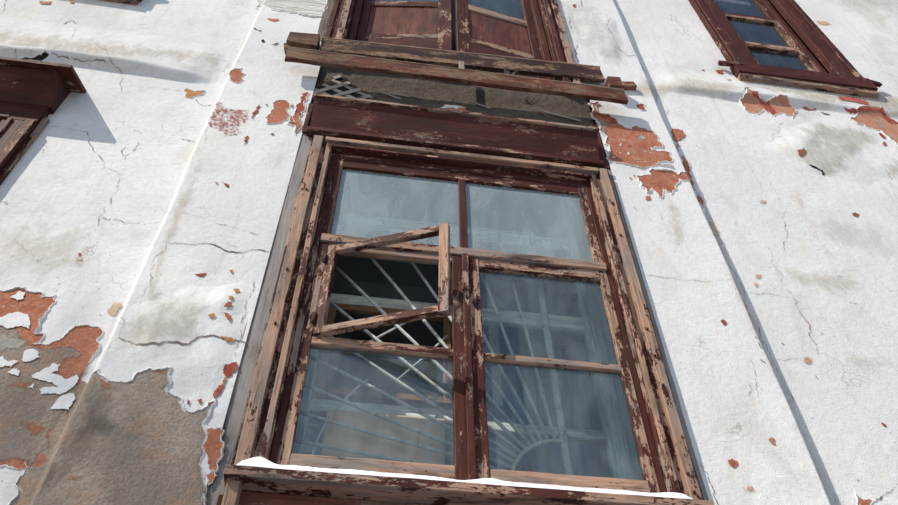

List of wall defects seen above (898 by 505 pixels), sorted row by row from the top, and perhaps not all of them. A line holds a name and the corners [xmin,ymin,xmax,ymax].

crack [53,126,156,230]
peeling [208,91,310,145]
peeling [587,101,719,236]
peeling [738,83,898,175]
crack [143,215,268,295]
crack [118,280,254,353]
crack [696,211,818,407]
peeling [0,287,240,505]